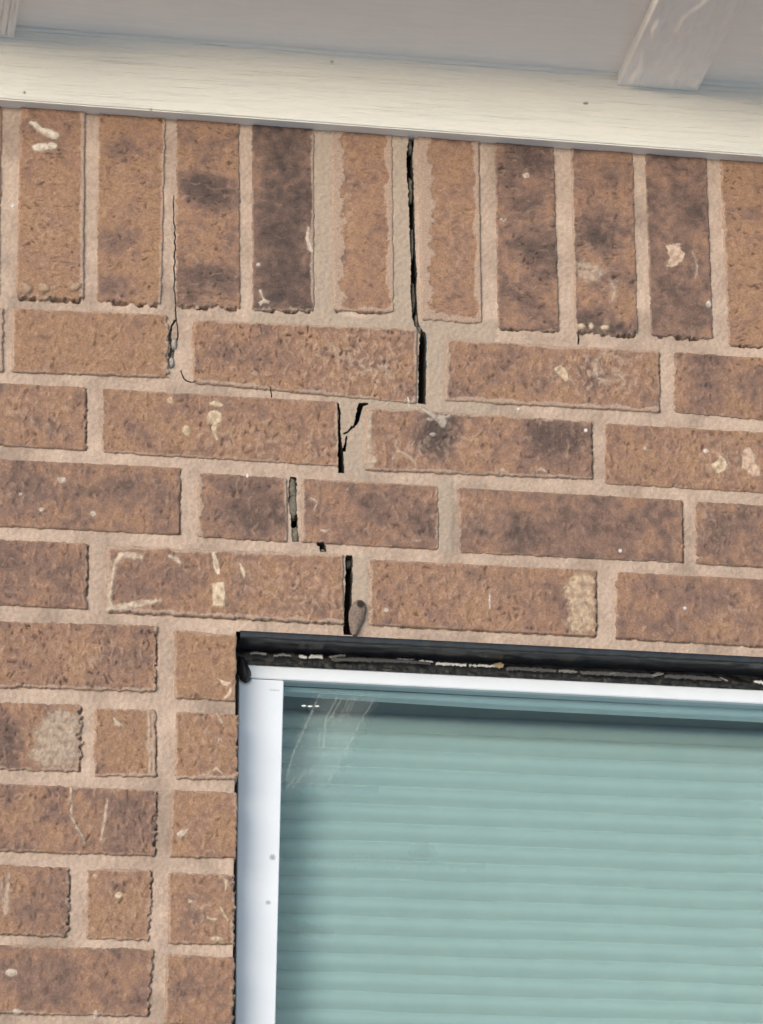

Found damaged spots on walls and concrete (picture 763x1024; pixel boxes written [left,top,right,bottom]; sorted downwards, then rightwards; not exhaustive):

crack [337,404,367,473]
crack [288,478,353,635]